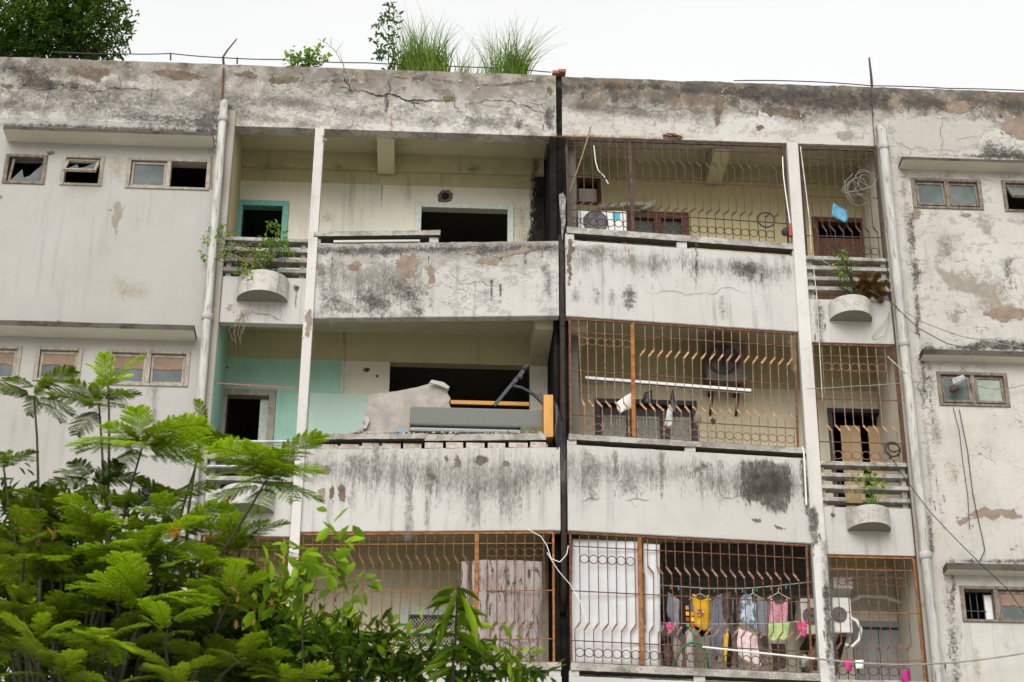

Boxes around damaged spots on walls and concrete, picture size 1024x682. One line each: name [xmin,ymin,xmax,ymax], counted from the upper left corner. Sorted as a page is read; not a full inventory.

spalling [64,64,110,83]
spalling [150,69,203,81]
crack [330,76,554,120]
leakage [558,81,888,121]
leakage [317,244,606,319]
leakage [682,242,772,281]
leakage [907,216,933,402]
peeling [925,269,1024,327]
spalling [444,455,487,468]
spalling [318,465,346,501]
peeling [956,506,1023,526]
leakage [686,459,836,679]